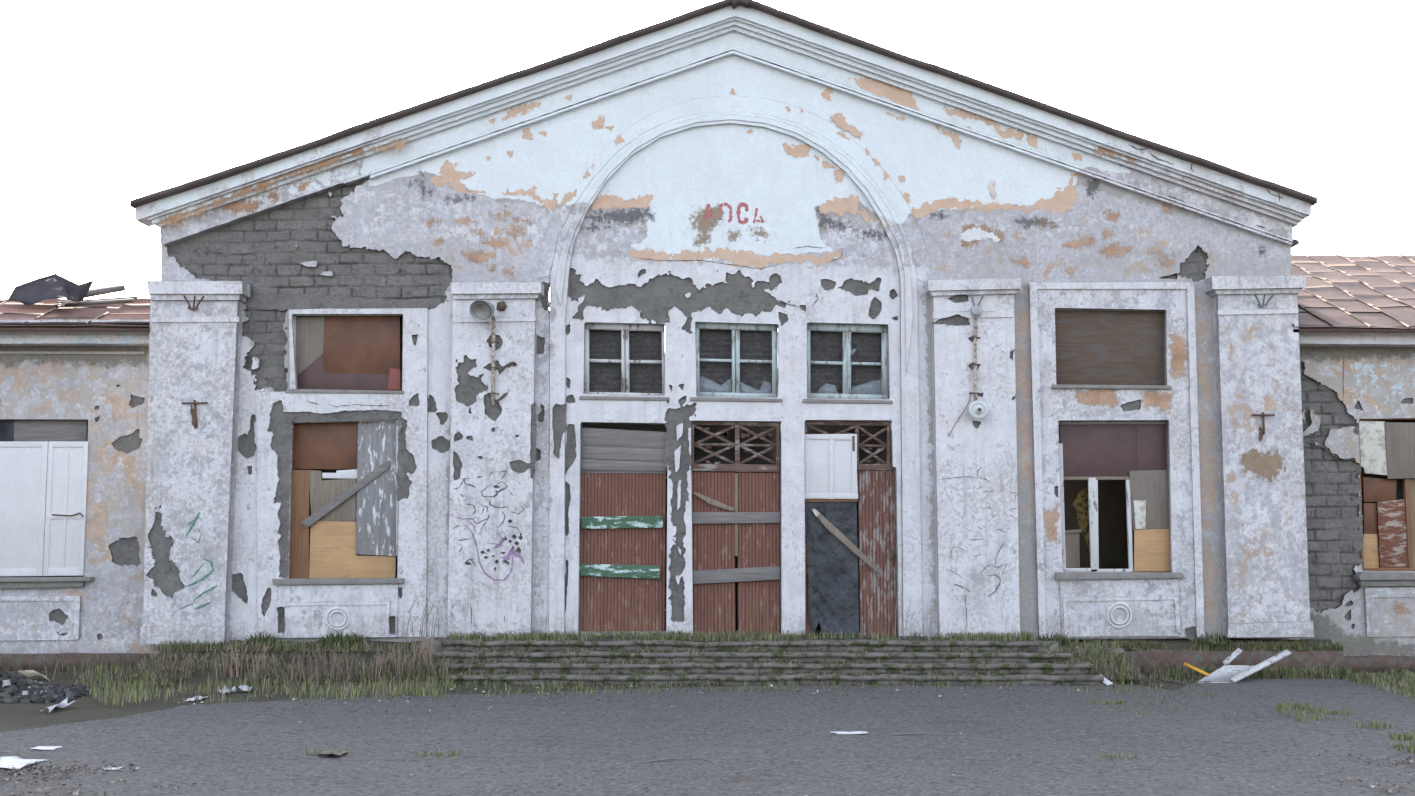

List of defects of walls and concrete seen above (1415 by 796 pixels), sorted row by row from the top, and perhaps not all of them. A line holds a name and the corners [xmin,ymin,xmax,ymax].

peeling [821,88,1083,242]
flaking render [112,429,143,453]
flaking render [109,506,185,598]
flaking render [160,179,523,632]
flaking render [537,335,545,354]
flaking render [510,377,577,536]
flaking render [541,282,550,311]
flaking render [663,384,696,622]
flaking render [566,205,898,335]
flaking render [1121,400,1141,411]
flaking render [1161,247,1208,282]
flaking render [1300,362,1365,629]